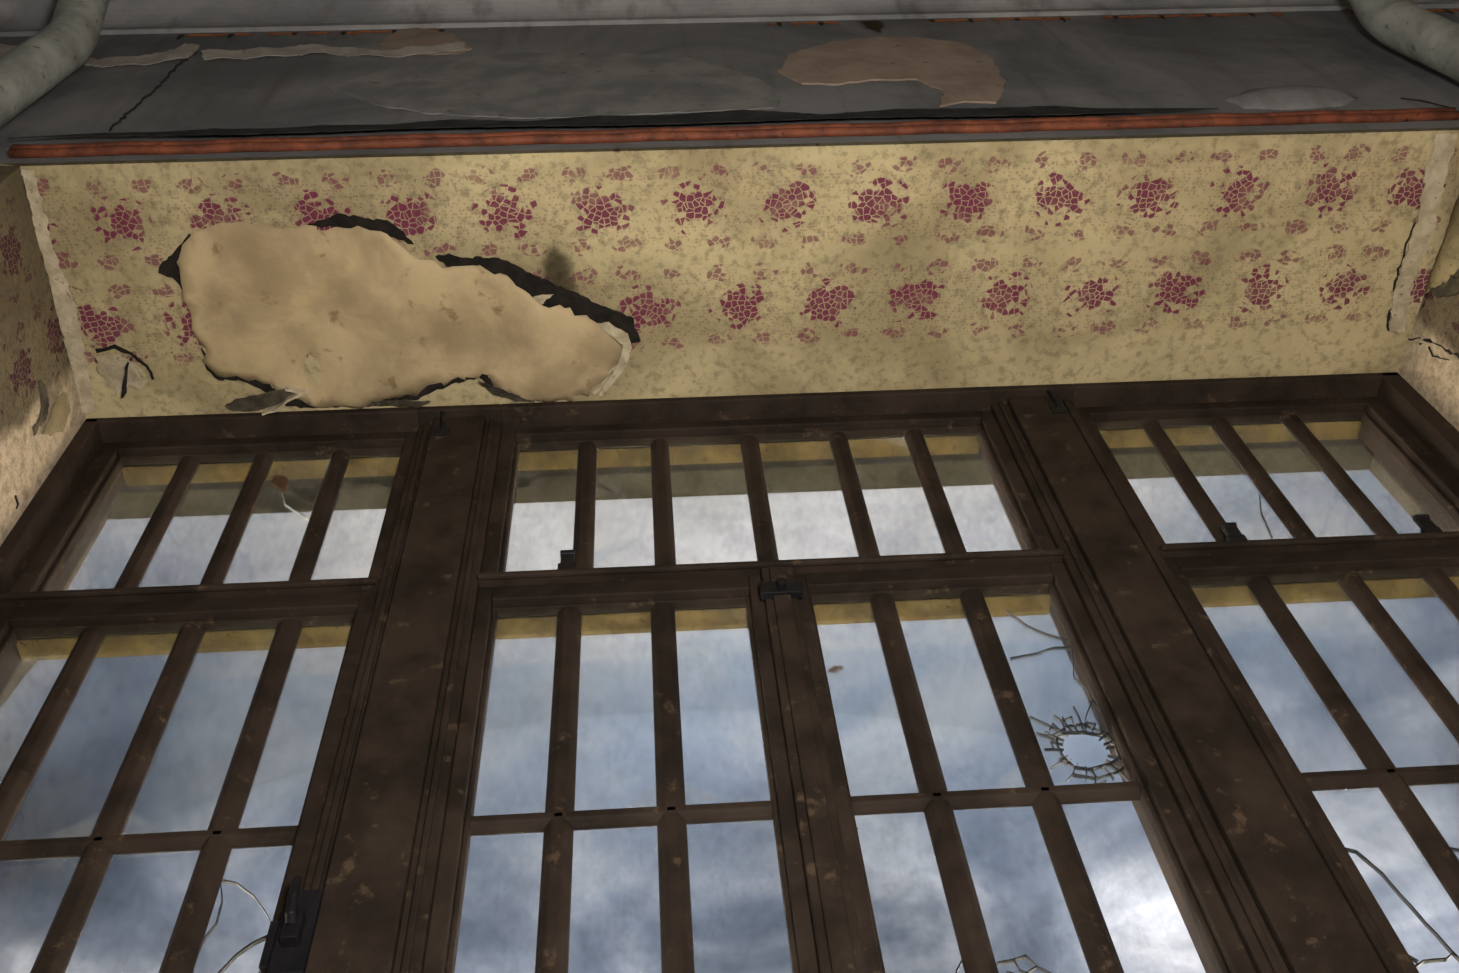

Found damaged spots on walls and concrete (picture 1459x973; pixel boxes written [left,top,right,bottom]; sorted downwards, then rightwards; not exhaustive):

peeling [533,294,554,305]
peeling [598,322,632,397]
peeling [478,381,557,402]